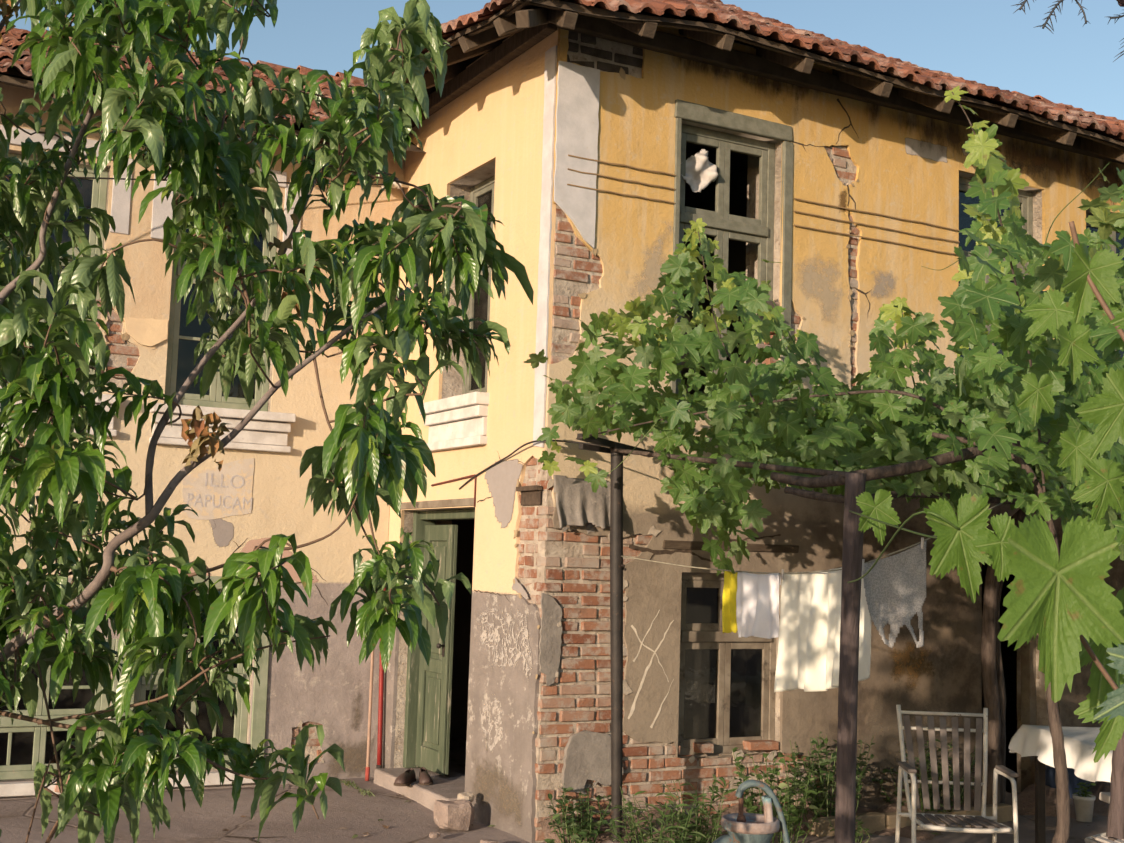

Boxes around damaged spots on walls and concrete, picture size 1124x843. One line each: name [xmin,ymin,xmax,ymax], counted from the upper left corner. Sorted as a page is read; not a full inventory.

spalling [567,31,643,80]
crack [792,99,859,151]
spalling [551,204,603,364]
spalling [480,457,820,843]